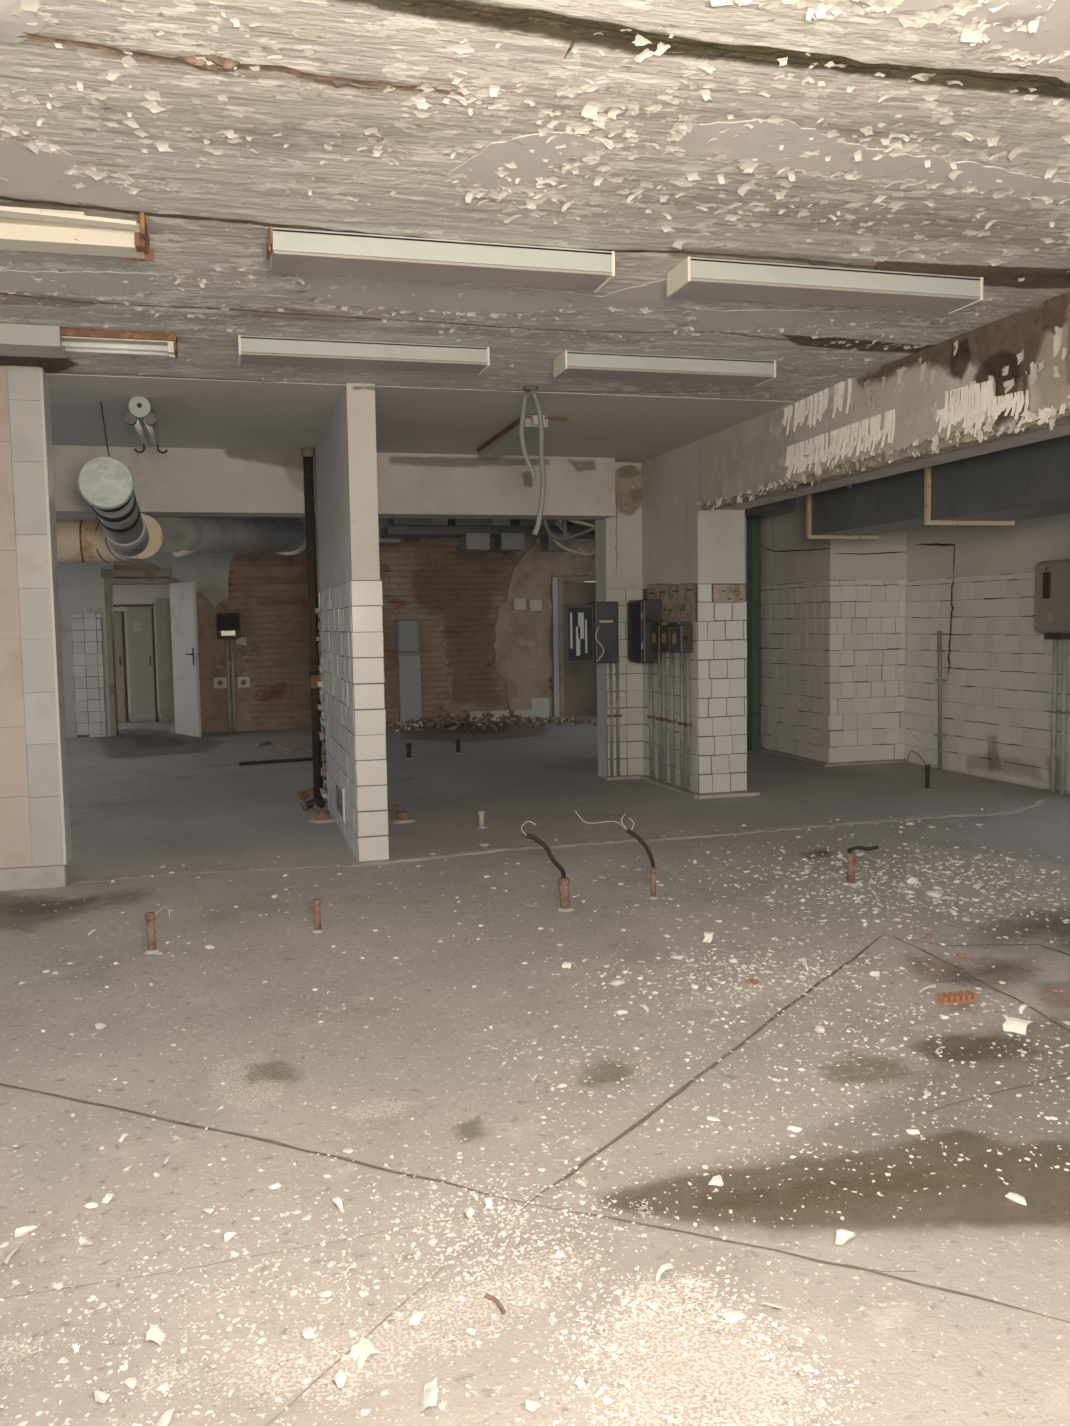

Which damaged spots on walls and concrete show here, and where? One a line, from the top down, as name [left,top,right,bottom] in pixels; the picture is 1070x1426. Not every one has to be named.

crack [18,32,463,94]
crack [341,0,1070,99]
peeling [0,0,1070,272]
peeling [0,249,750,358]
crack [0,293,934,353]
spalling [661,293,1070,514]
damp [859,291,1070,426]
flaking render [469,698,549,721]
damp [921,1037,1022,1059]
crack [0,932,1070,1426]
damp [616,1133,1070,1224]